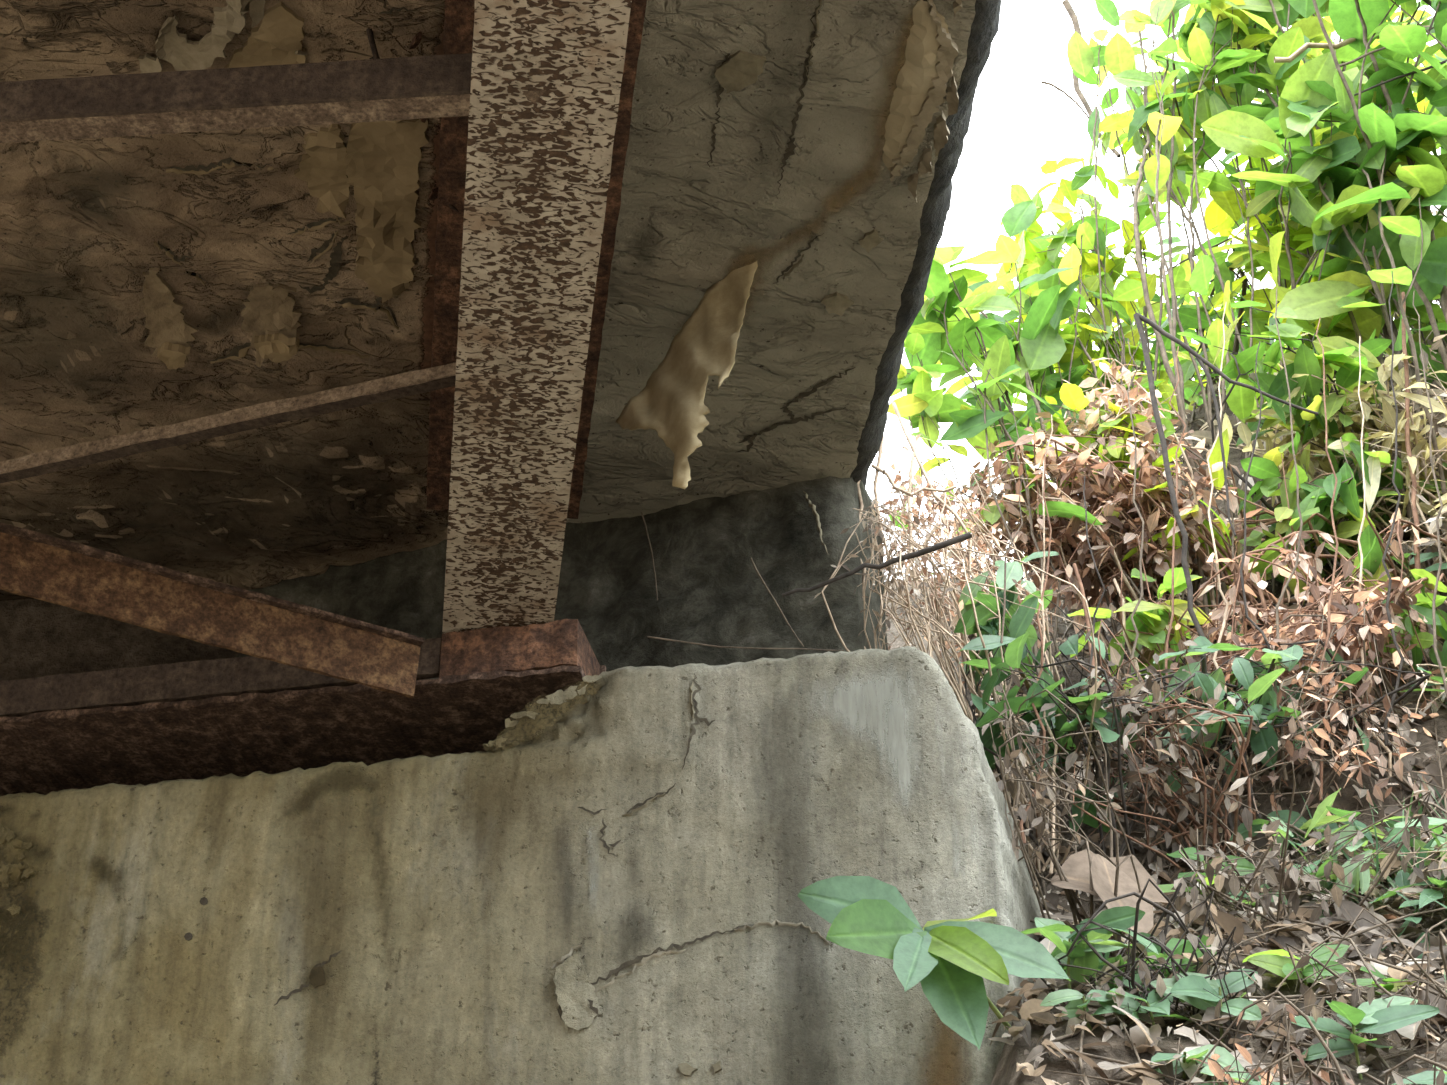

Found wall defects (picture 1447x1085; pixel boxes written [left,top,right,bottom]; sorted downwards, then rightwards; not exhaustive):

flaking render [139,0,307,73]
crack [707,53,730,167]
crack [776,0,822,199]
rust [419,118,441,370]
crack [735,367,856,453]
spalling [482,675,606,752]
crack [577,673,715,857]
crack [591,919,830,993]